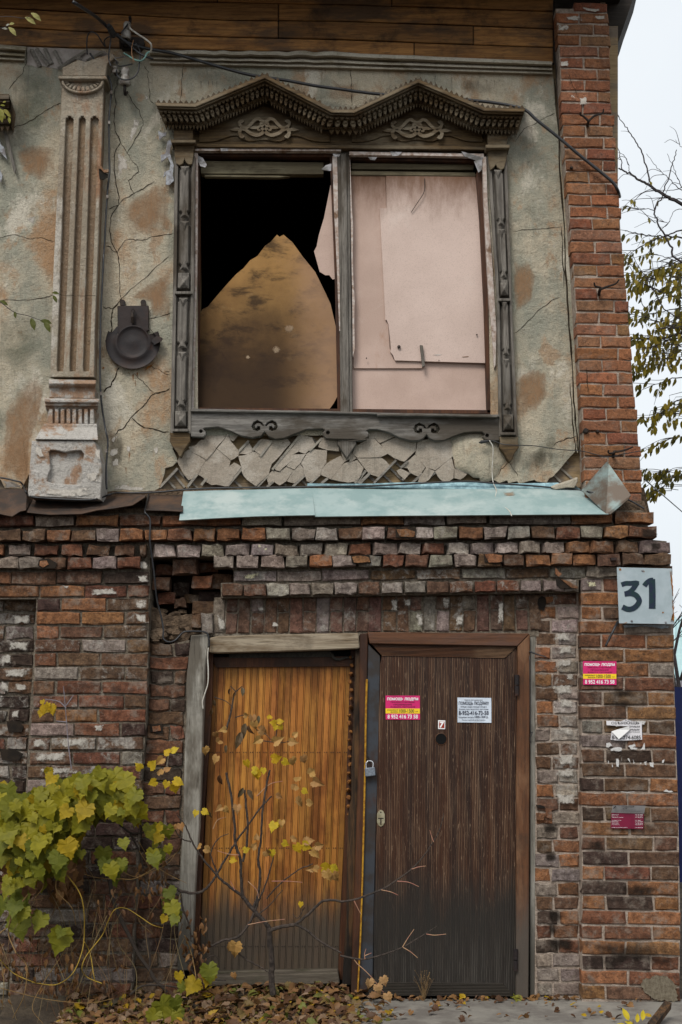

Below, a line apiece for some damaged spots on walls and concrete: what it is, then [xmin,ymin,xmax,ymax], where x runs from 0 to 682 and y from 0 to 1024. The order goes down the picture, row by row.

crack [6,66,173,332]
peeling [45,472,97,497]
flaking render [160,431,467,489]
spalling [136,562,233,622]